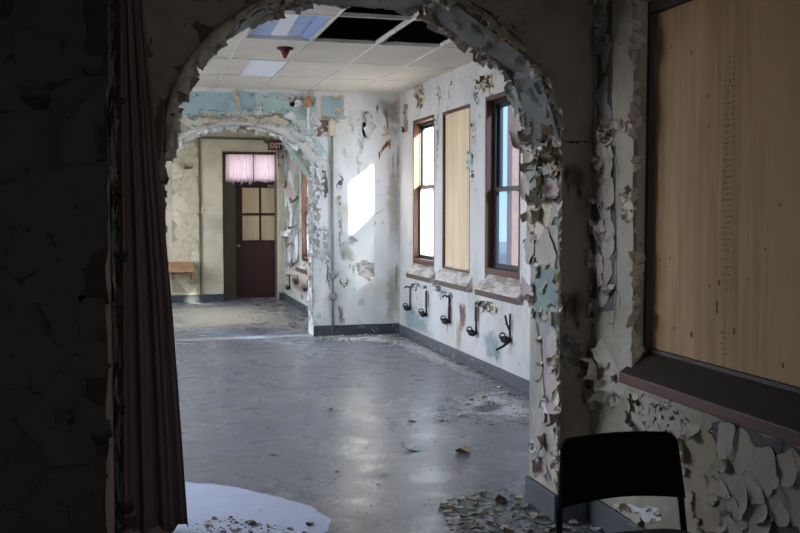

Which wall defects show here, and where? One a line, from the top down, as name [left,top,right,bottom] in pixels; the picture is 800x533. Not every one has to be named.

peeling [143,0,628,491]
peeling [584,0,646,360]
peeling [613,502,662,527]
peeling [623,391,800,533]